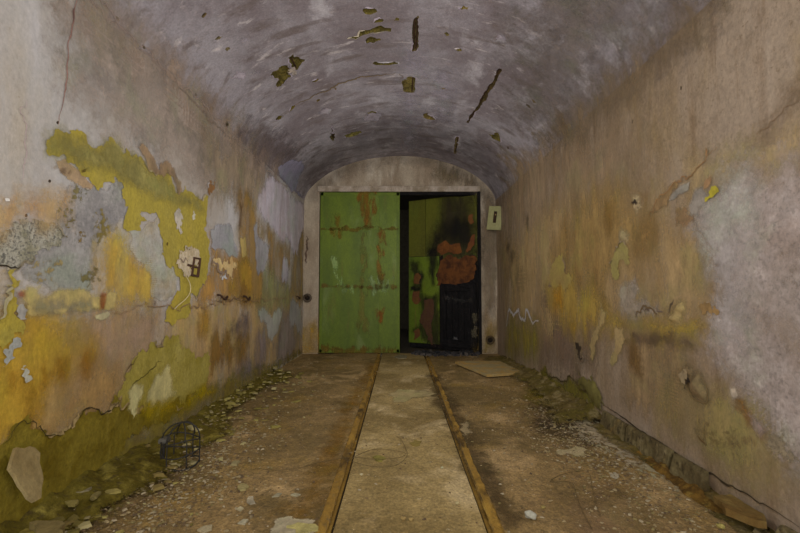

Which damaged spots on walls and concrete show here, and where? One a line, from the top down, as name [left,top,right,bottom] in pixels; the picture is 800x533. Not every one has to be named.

crack [58,0,77,125]
spalling [270,55,305,87]
spalling [347,7,399,44]
spalling [402,76,417,93]
spalling [411,16,419,52]
peeling [0,121,238,418]
leakage [0,0,319,445]
rust [321,192,397,290]
leakage [498,0,800,476]
peeling [652,182,719,215]
crack [604,405,678,454]
crack [701,467,799,527]